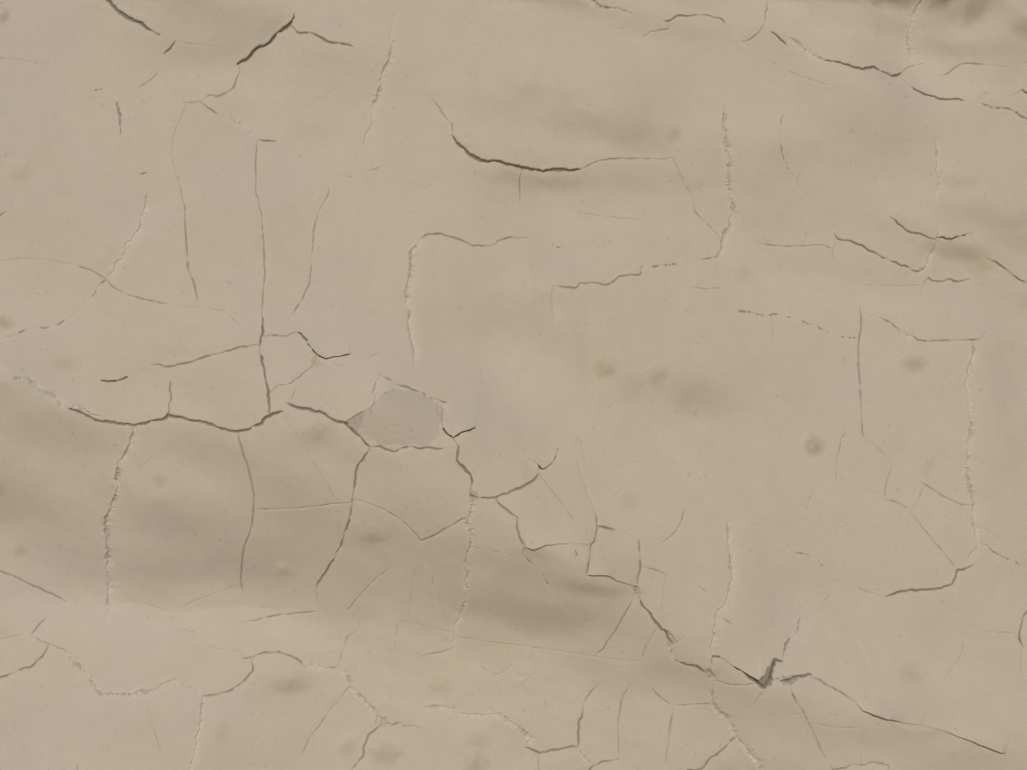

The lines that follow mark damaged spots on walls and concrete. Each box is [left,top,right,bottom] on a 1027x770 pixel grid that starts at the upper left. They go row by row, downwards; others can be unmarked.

crack [94,0,359,104]
crack [536,0,1027,124]
crack [756,131,1027,289]
crack [0,91,816,770]
crack [802,303,868,514]
spalling [754,656,803,692]
crack [980,604,1027,700]
crack [833,757,895,770]